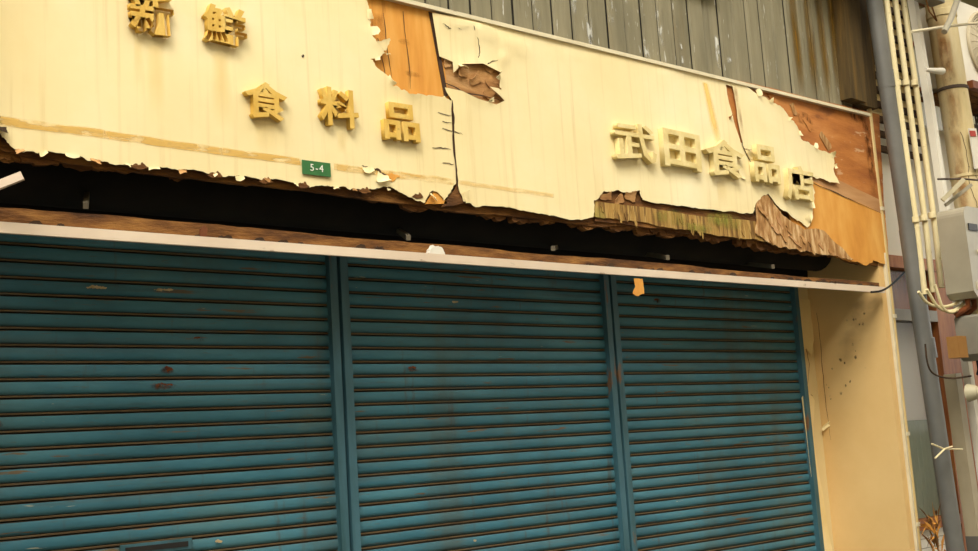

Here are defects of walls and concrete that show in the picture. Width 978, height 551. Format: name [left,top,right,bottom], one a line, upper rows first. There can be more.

peeling [367,0,504,104]
spalling [65,152,101,164]
spalling [125,162,160,170]
crack [432,100,458,187]
peeling [600,191,637,204]
peeling [737,80,889,266]
spalling [0,203,808,277]